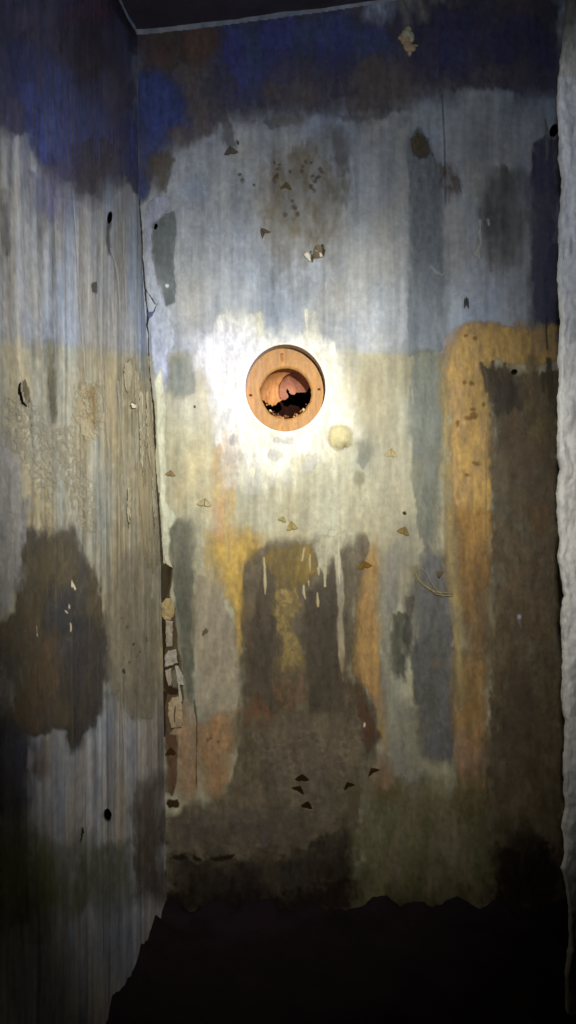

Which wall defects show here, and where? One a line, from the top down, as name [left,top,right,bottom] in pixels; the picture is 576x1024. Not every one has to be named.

damp [0,294,122,812]
crack [139,199,163,563]
peeling [124,357,184,736]
corrosion [210,433,262,656]
damp [134,196,379,909]
damp [0,0,558,199]
damp [267,147,346,243]
spalling [303,244,325,262]
corrosion [443,322,560,818]
damp [480,356,565,902]
damp [530,125,560,325]